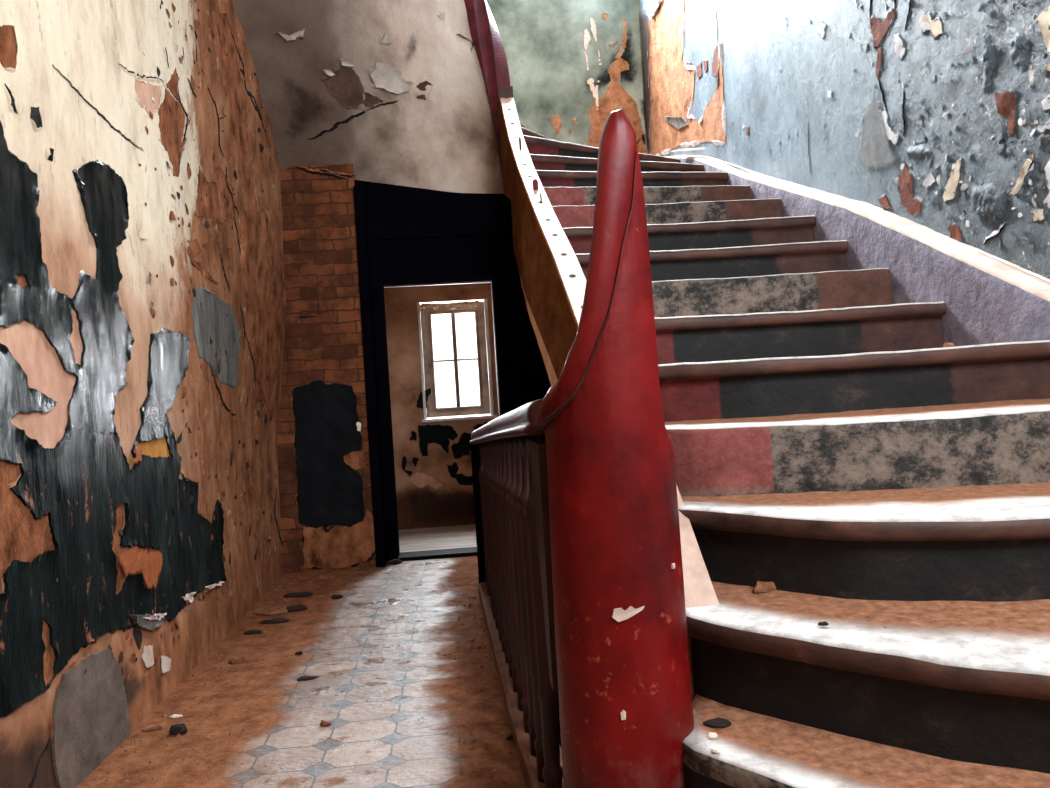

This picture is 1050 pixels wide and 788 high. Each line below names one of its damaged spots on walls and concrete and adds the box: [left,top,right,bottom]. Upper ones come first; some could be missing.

crack [52,64,143,151]
crack [225,13,266,133]
crack [308,99,398,139]
flaking render [320,57,433,112]
flaking render [550,0,739,156]
crack [119,46,256,387]
peeling [0,0,276,788]
crack [209,362,236,416]
peeling [402,415,499,489]
peeling [612,606,645,622]